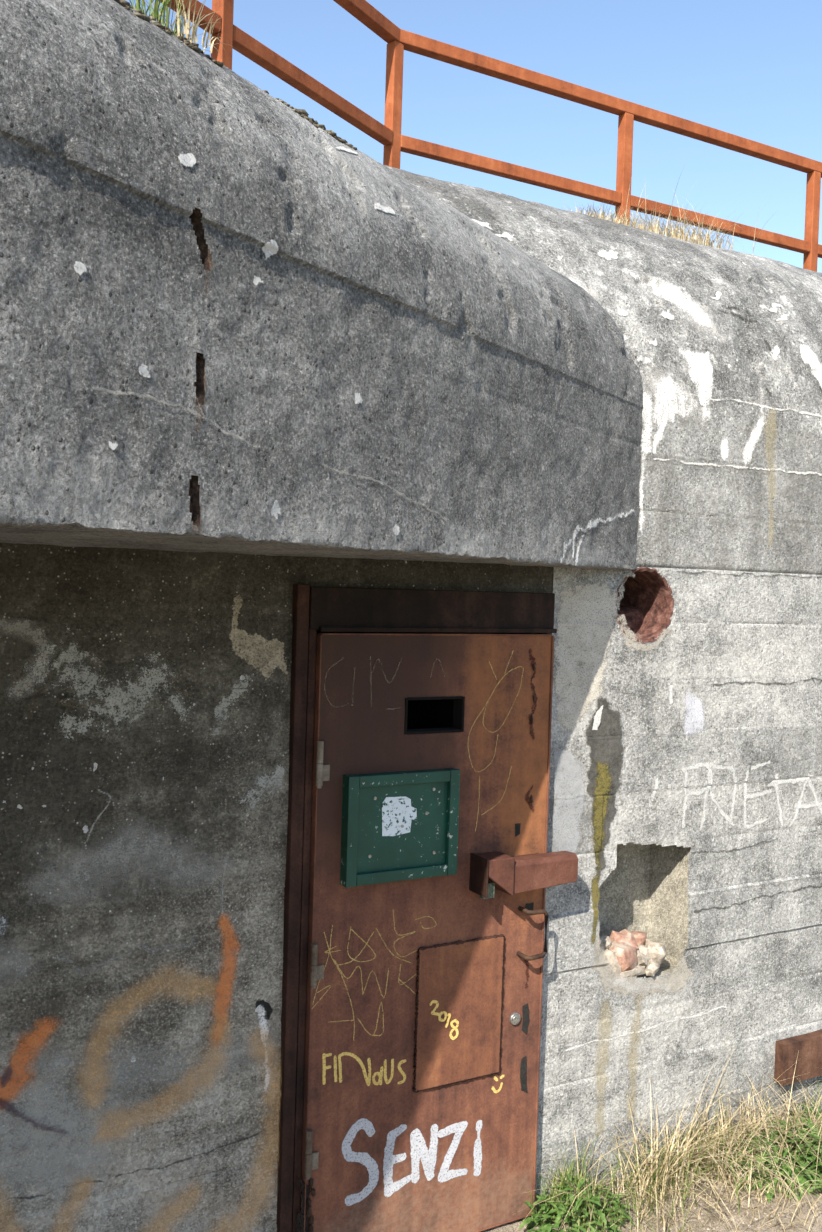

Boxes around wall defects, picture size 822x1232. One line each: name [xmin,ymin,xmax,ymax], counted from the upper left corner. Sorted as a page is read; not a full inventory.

leakage [472,219,514,242]
leakage [760,303,790,321]
leakage [720,379,765,466]
spalling [616,571,672,651]
peeling [211,594,289,737]
spalling [592,927,693,999]
crack [7,1128,272,1200]